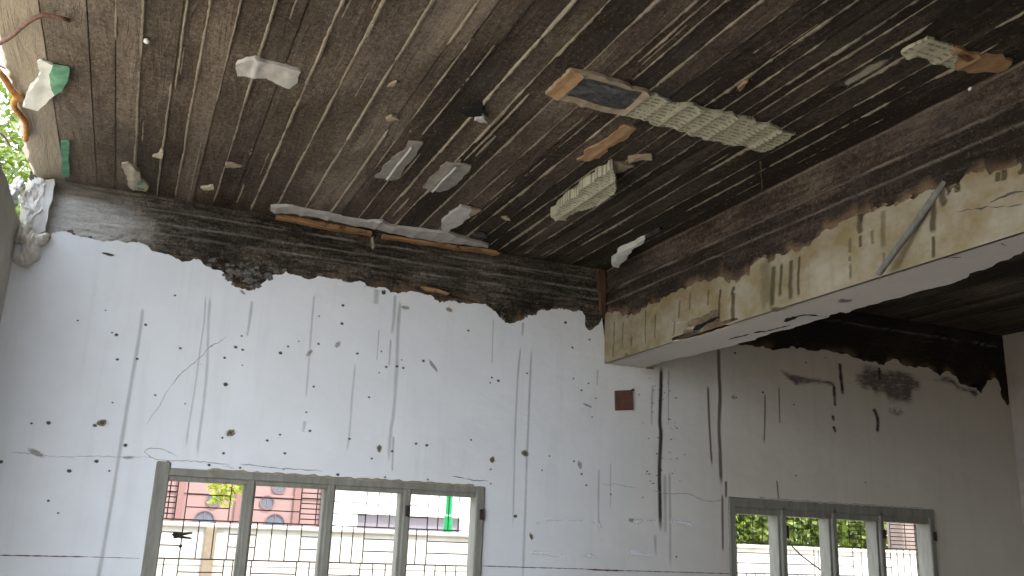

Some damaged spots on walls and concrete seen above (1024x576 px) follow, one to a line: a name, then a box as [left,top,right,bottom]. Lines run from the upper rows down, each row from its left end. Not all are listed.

flaking render [46,60,1024,330]
crack [148,338,225,422]
flaking render [672,309,738,341]
damp [786,363,844,432]
flaking render [738,311,1010,405]
damp [859,368,919,413]
crack [13,448,319,471]
damp [646,370,678,525]